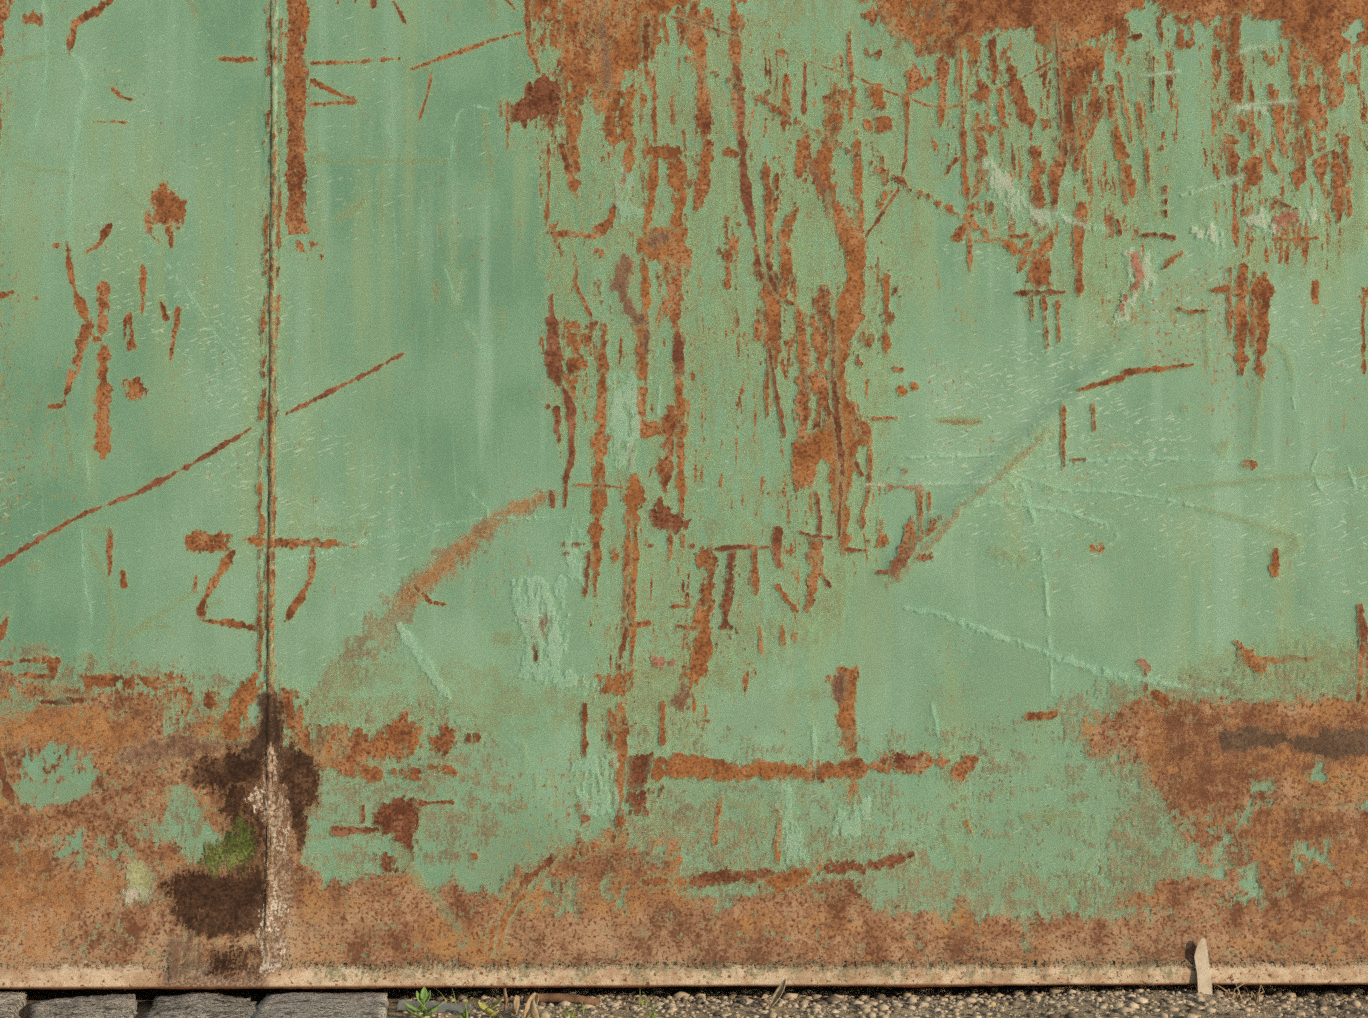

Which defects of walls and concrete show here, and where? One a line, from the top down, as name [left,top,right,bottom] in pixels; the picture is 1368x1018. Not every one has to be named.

rust [0,0,46,145]
rust [86,222,114,254]
rust [92,264,182,460]
rust [261,352,276,380]
rust [736,368,749,414]
rust [645,655,675,670]
rust [731,647,757,700]
leakage [158,690,323,980]